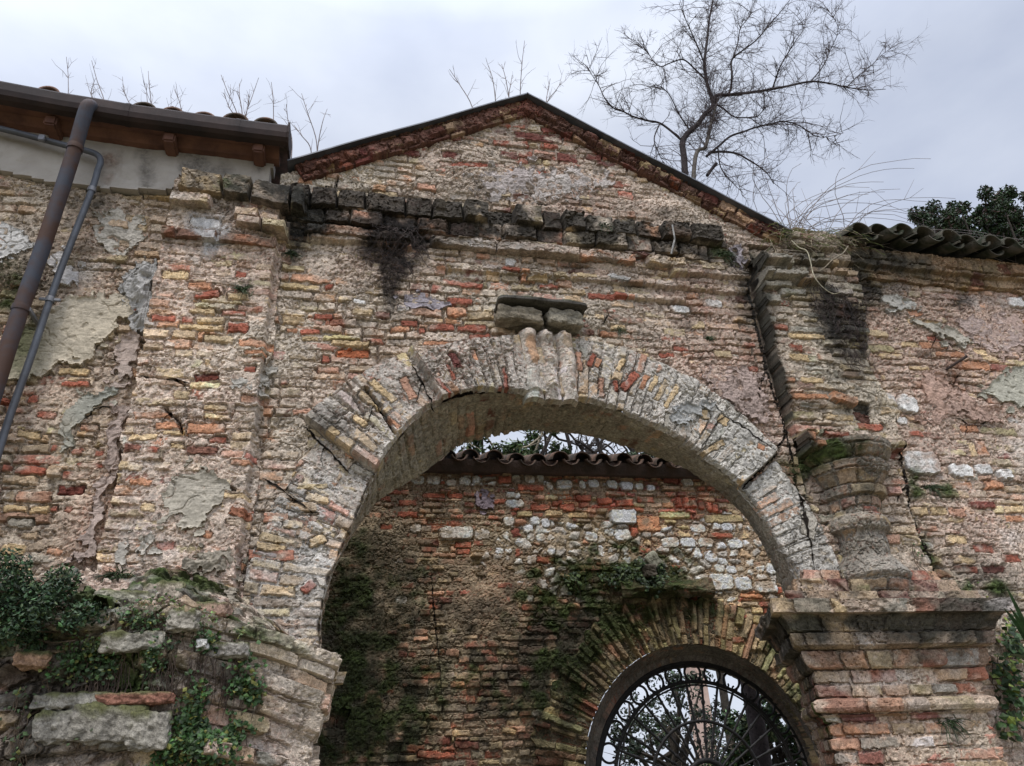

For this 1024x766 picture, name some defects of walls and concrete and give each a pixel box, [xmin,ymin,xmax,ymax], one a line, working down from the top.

peeling [0,221,35,263]
peeling [92,207,148,270]
damp [361,209,428,299]
peeling [6,245,142,565]
crack [303,426,350,474]
crack [412,365,434,411]
crack [704,270,815,570]
peeling [879,294,1024,427]
peeling [114,446,253,566]
crack [263,478,316,514]